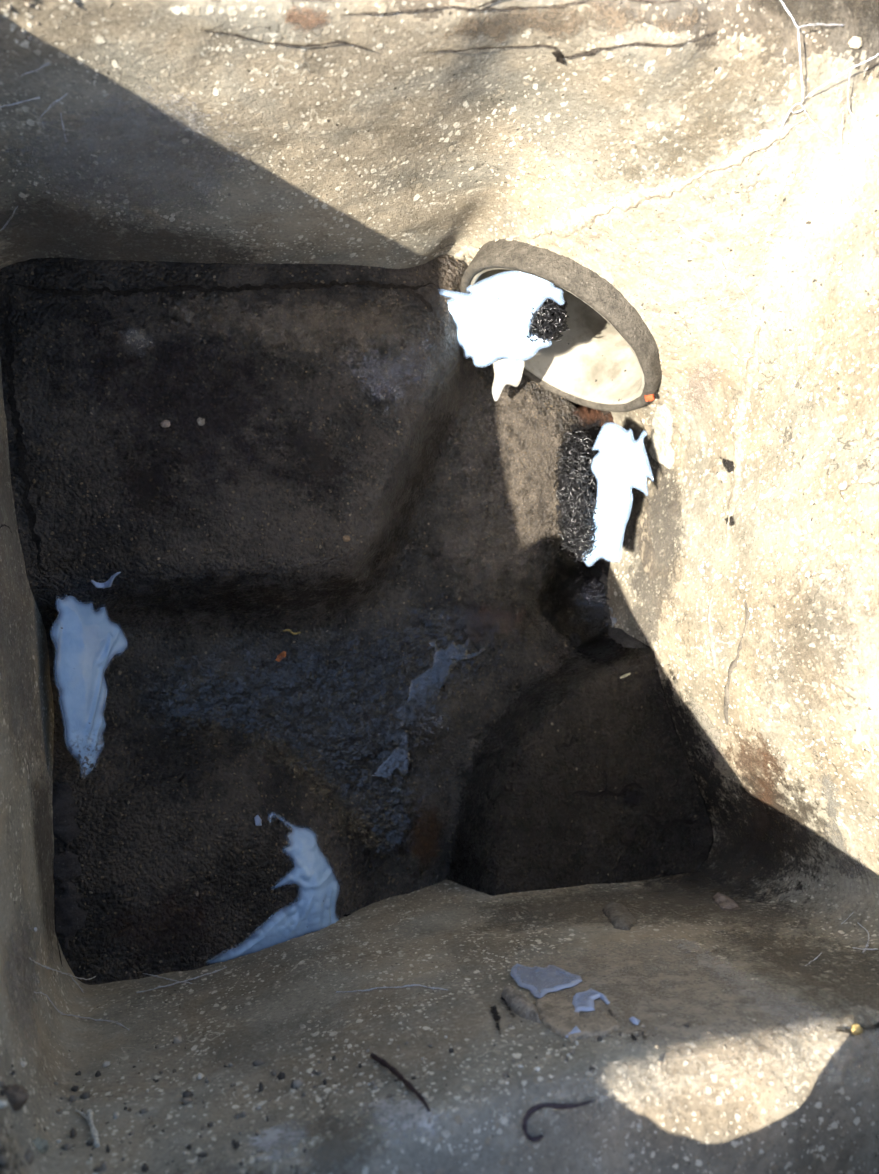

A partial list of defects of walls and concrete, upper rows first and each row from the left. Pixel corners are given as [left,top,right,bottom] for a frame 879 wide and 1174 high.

crack [197,0,589,51]
crack [421,32,716,65]
crack [633,0,679,8]
damp [58,311,367,519]
damp [98,378,602,629]
damp [445,557,639,892]